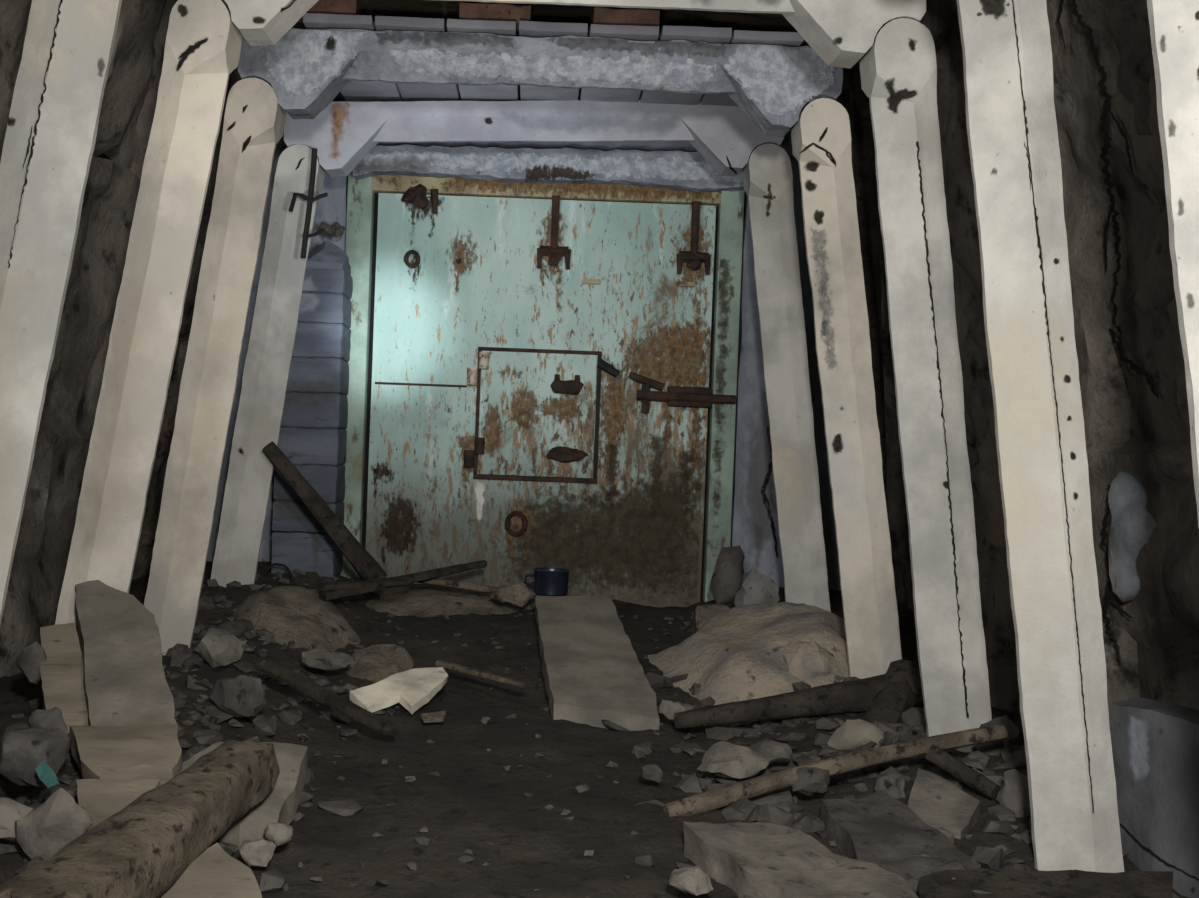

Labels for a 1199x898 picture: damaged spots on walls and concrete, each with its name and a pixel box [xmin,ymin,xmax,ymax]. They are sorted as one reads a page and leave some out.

spalling [977,0,1010,19]
crack [176,38,208,71]
spalling [885,80,917,113]
corrosion [333,104,348,156]
crack [799,127,836,167]
corrosion [404,177,717,309]
corrosion [458,364,582,498]
corrosion [497,222,729,594]
corrosion [371,463,423,570]